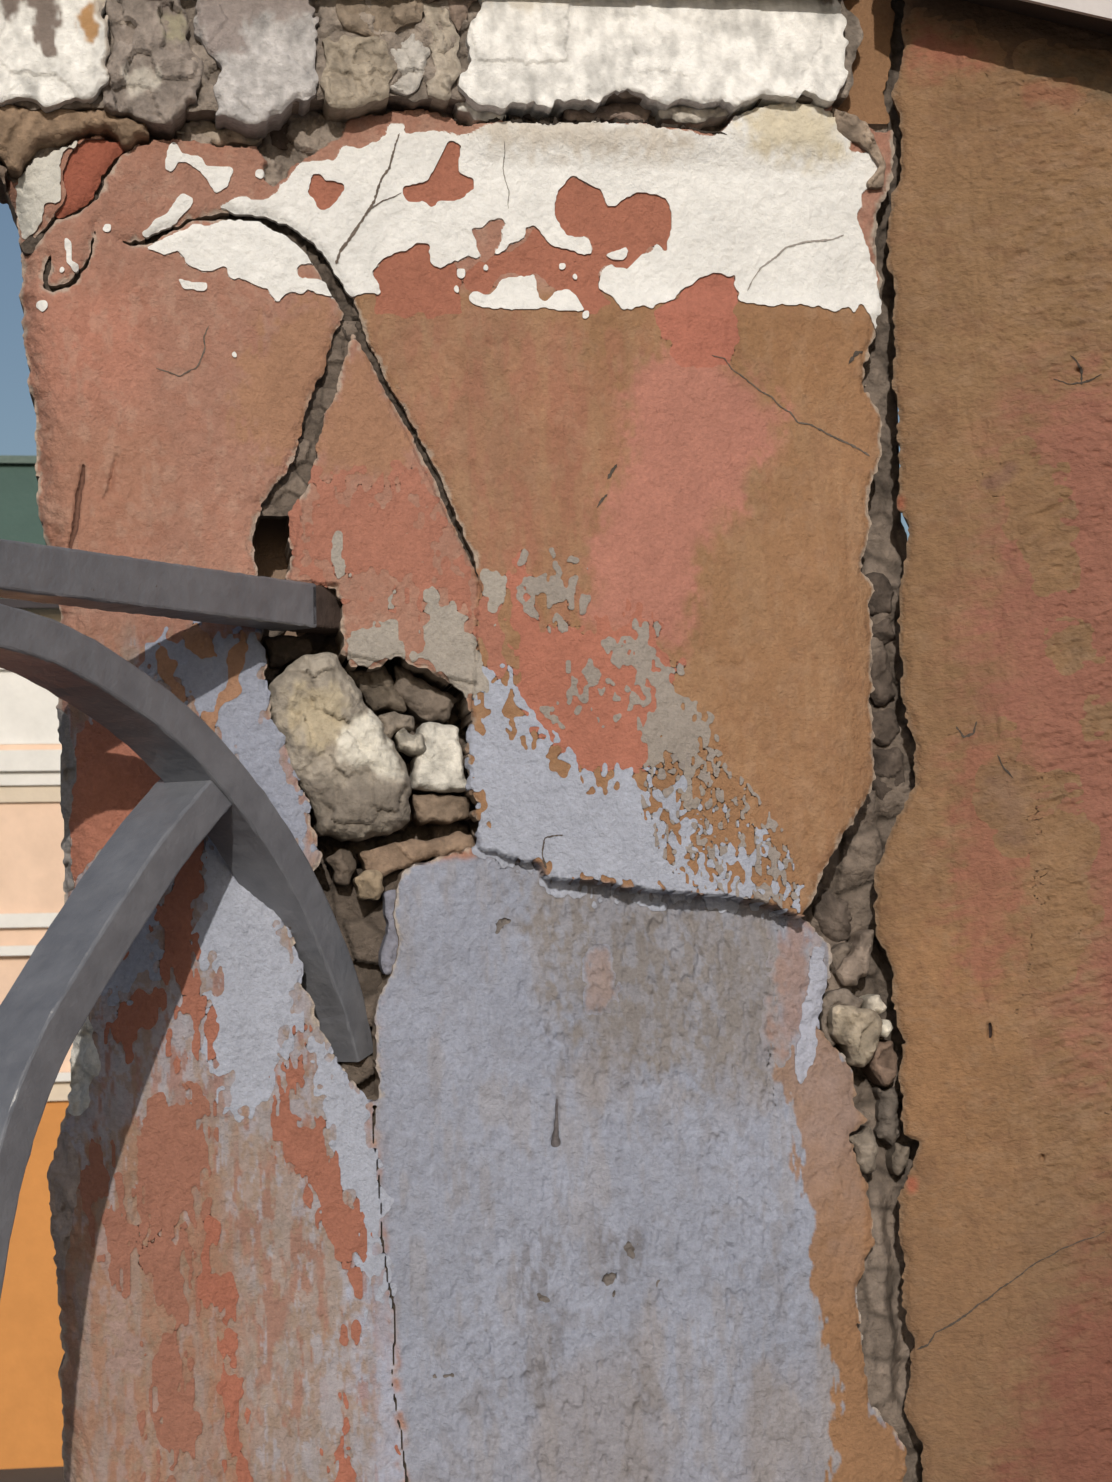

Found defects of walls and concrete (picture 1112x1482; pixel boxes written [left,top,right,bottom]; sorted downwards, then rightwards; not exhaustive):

peeling [36,300,48,312]
peeling [60,238,79,274]
spalling [15,139,125,240]
crack [21,144,148,292]
crack [132,133,473,566]
peeling [142,115,882,368]
peeling [57,709,161,893]
peeling [139,460,804,1031]
crack [712,0,1105,1482]
peeling [47,835,397,1482]
crack [372,1105,407,1482]
peeling [767,946,907,1482]